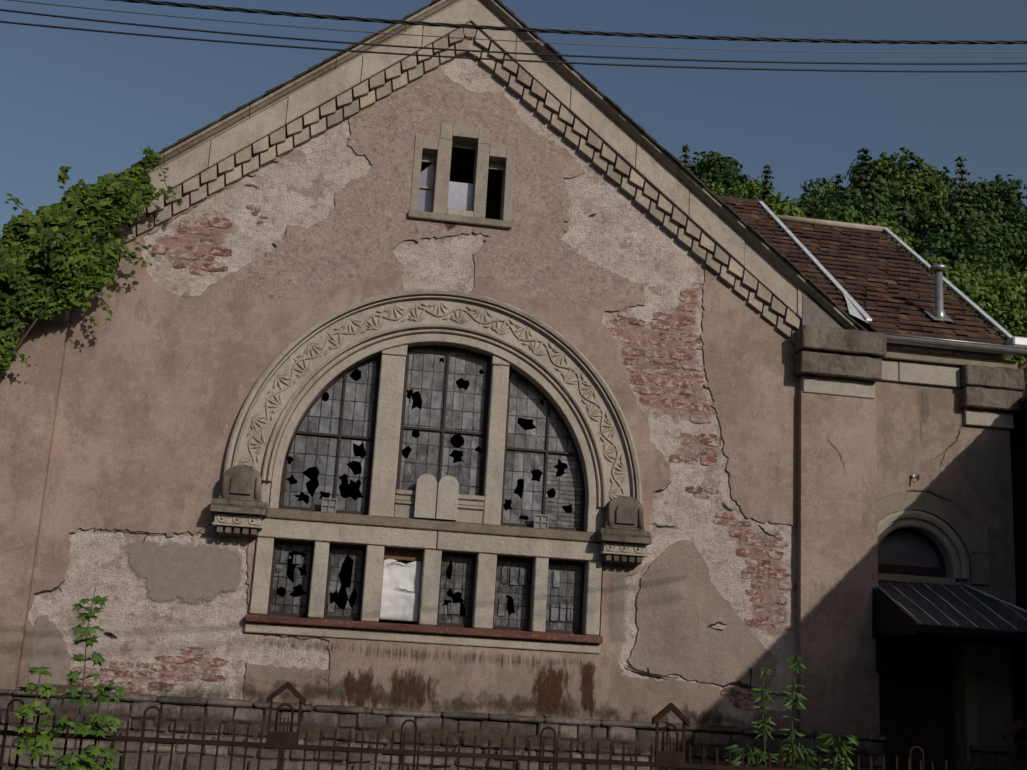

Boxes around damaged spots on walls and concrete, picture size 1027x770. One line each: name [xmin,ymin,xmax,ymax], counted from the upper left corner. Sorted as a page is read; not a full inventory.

flaking render [142,118,372,297]
flaking render [393,227,492,294]
flaking render [442,54,797,728]
crack [906,418,974,524]
flaking render [28,526,331,705]
damp [161,662,619,720]
damp [684,710,760,728]